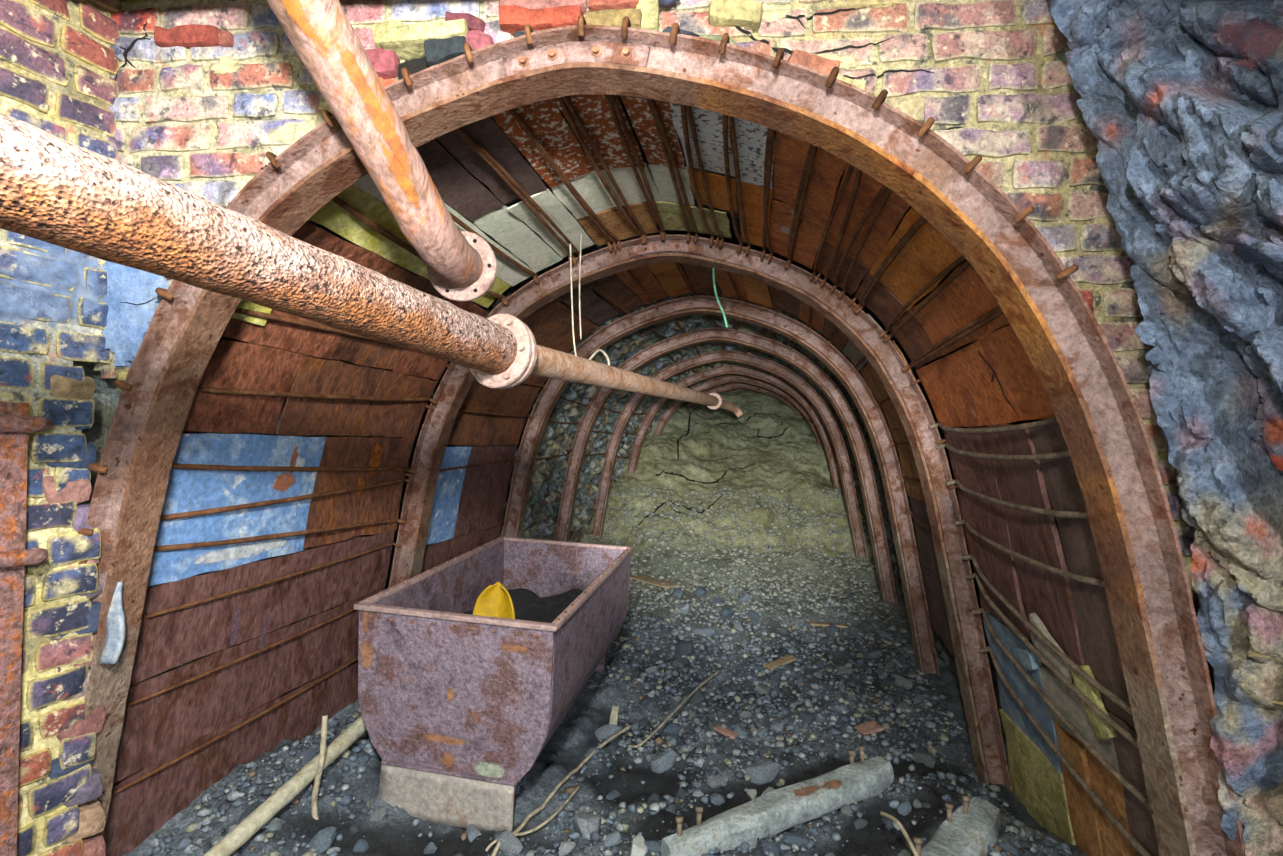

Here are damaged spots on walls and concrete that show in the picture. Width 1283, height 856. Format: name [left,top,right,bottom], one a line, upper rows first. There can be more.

crack [115,22,151,81]